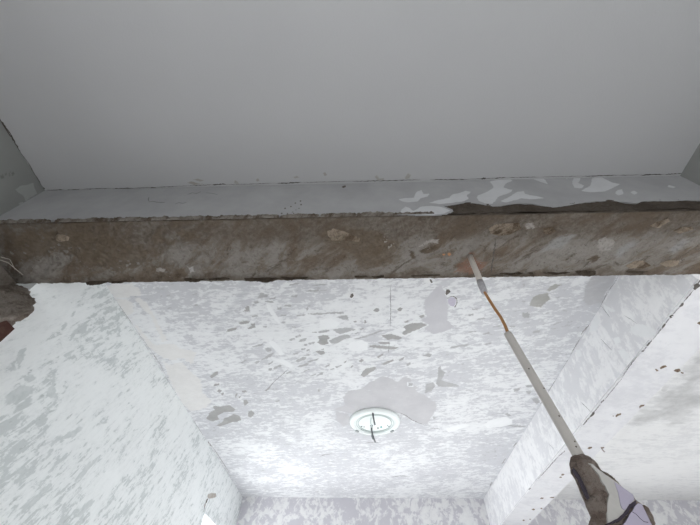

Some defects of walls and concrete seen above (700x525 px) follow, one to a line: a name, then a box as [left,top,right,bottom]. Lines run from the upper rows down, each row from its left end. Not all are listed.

spalling [0,177,700,236]
peeling [226,277,429,378]
peeling [423,365,462,394]